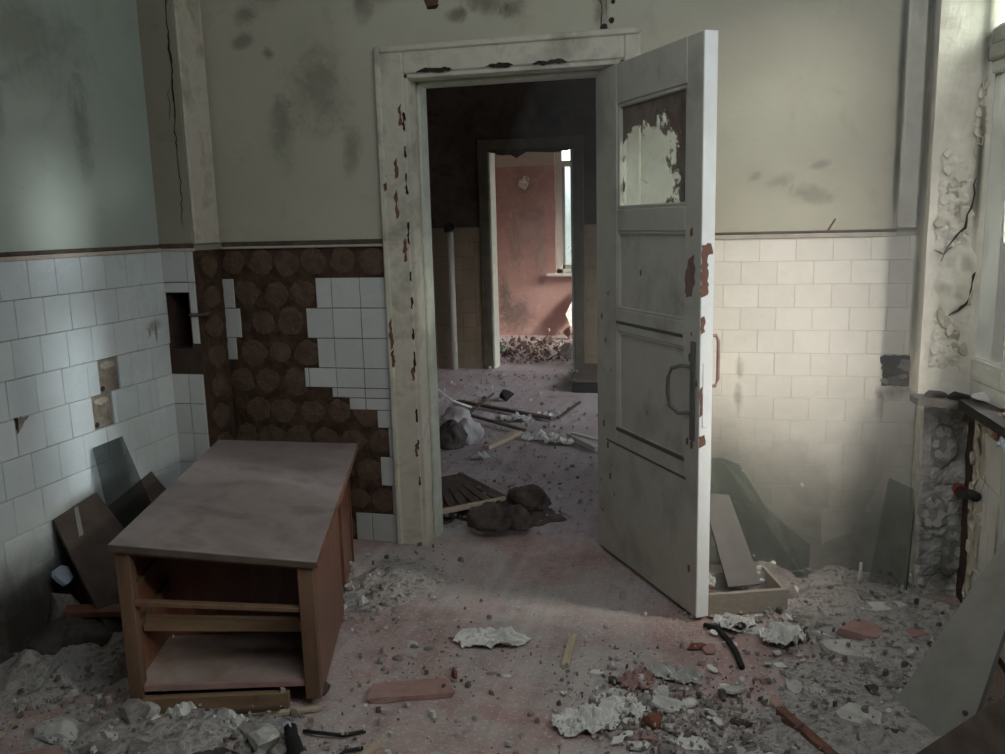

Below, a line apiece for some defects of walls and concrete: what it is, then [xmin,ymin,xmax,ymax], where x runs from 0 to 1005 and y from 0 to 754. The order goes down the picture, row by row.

peeling [424,0,439,9]
crack [165,0,183,225]
peeling [383,158,400,219]
peeling [623,90,686,203]
peeling [933,78,989,261]
peeling [91,357,119,428]
peeling [172,247,396,540]
peeling [927,305,968,371]
spalling [917,420,1001,602]